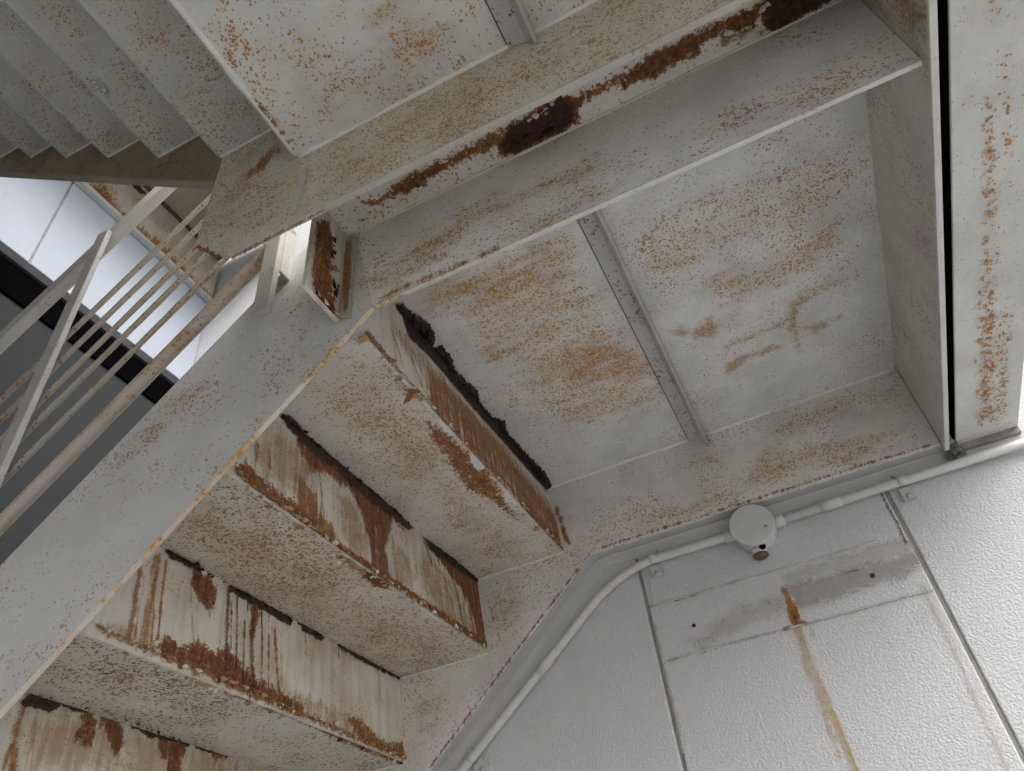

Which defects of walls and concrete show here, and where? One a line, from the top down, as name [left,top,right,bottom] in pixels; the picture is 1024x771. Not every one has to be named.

rust [354,0,830,223]
rust [708,0,928,143]
rust [342,148,665,545]
rust [633,147,871,308]
rust [722,271,858,372]
rust [974,92,1014,426]
rust [602,389,931,548]
rust [125,414,444,716]
rust [329,350,590,767]
rust [782,587,806,631]
rust [2,694,228,771]